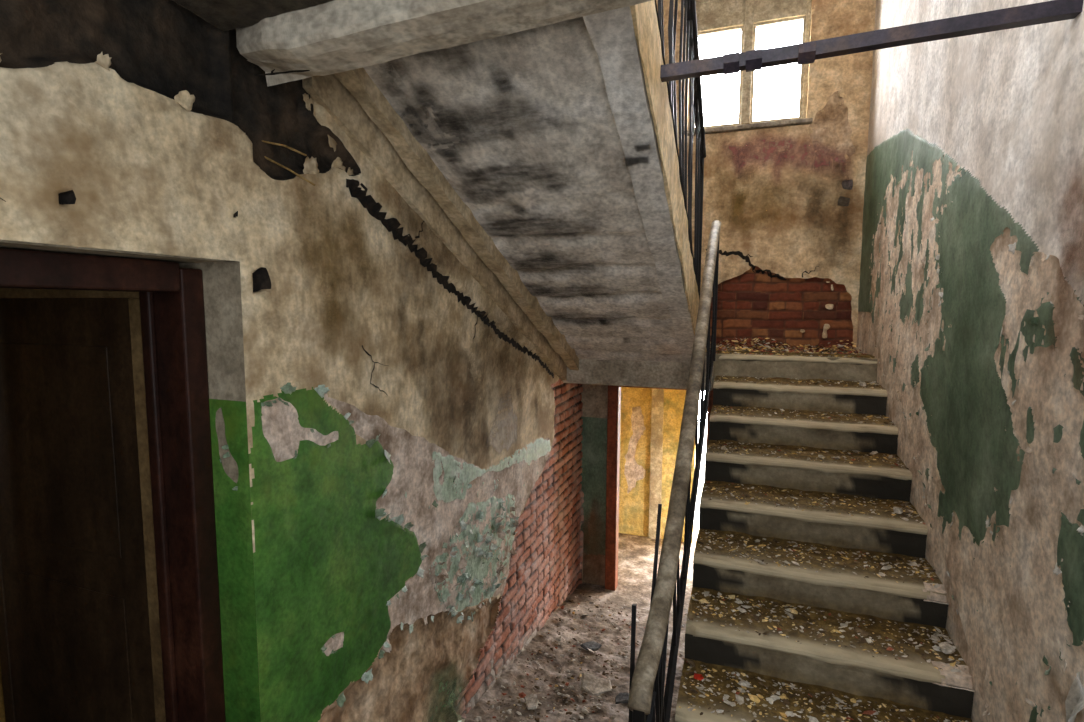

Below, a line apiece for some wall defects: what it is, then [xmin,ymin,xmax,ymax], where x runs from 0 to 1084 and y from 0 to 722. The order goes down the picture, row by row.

spalling [0,0,361,180]
damp [406,90,536,162]
spalling [58,190,76,204]
damp [465,166,561,199]
damp [489,206,579,237]
crack [346,175,554,378]
damp [514,258,588,272]
crack [706,249,819,280]
crack [362,345,389,395]
peeling [261,382,339,462]
peeling [710,151,1084,722]
flaking render [314,378,584,722]